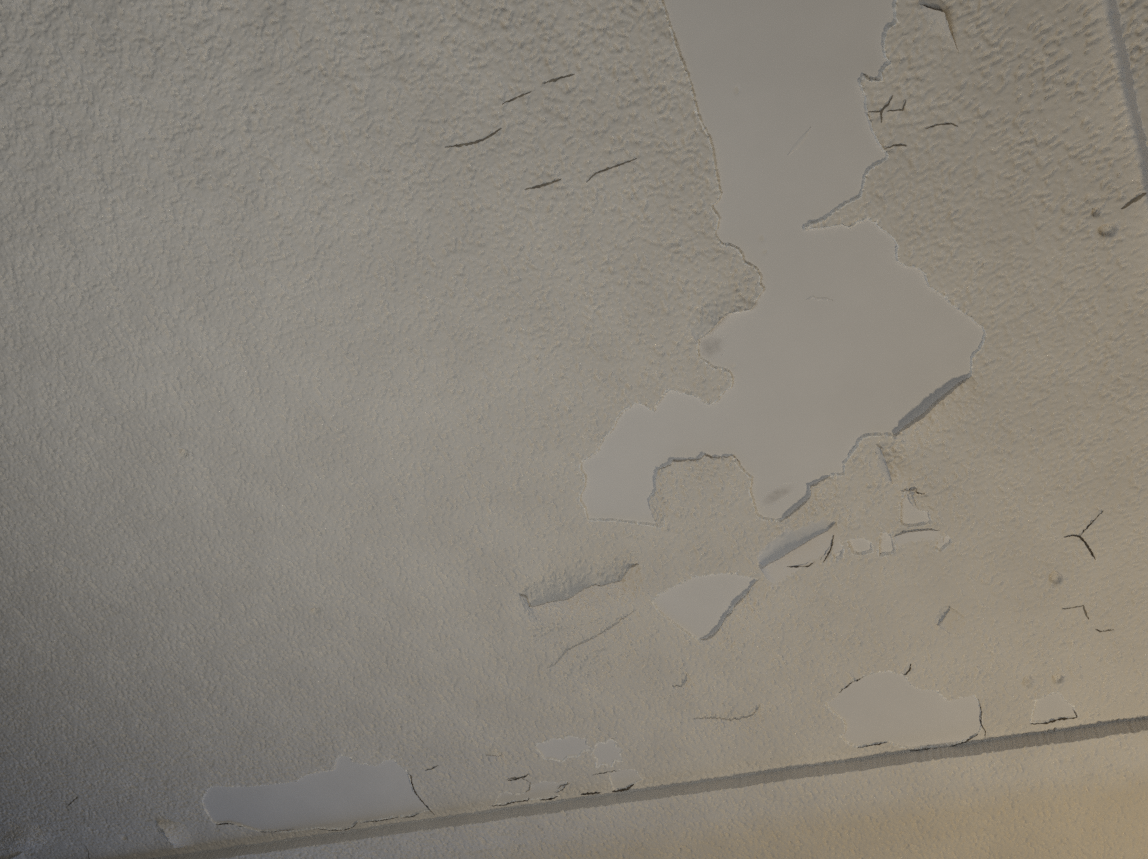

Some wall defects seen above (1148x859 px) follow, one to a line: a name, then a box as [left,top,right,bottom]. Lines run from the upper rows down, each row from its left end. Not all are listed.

peeling [578,0,988,653]
peeling [824,670,983,749]
peeling [1022,673,1079,723]